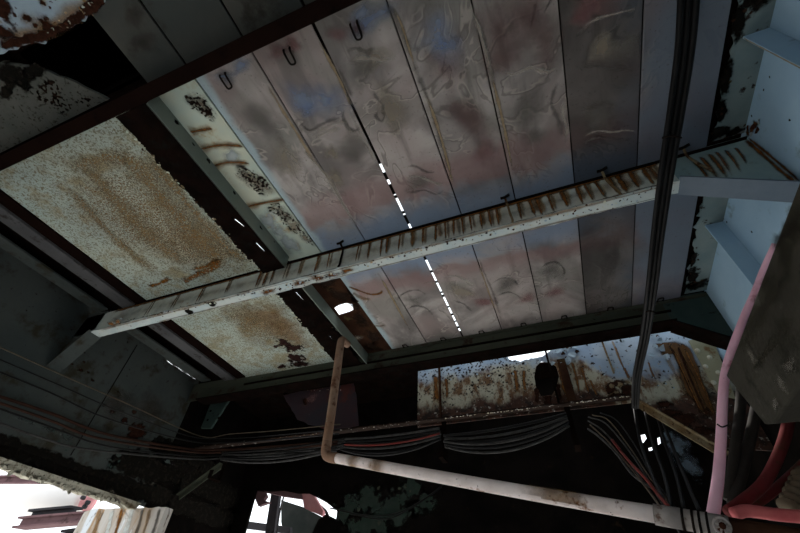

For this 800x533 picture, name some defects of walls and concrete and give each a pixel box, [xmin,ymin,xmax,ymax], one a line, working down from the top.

spalling [30,78,93,114]
corrosion [190,127,248,168]
corrosion [694,148,746,177]
peeling [746,119,760,137]
corrosion [746,139,799,181]
corrosion [71,149,658,369]
corrosion [433,377,449,400]
corrosion [513,370,566,404]
corrosion [571,341,632,400]
corrosion [656,342,716,436]